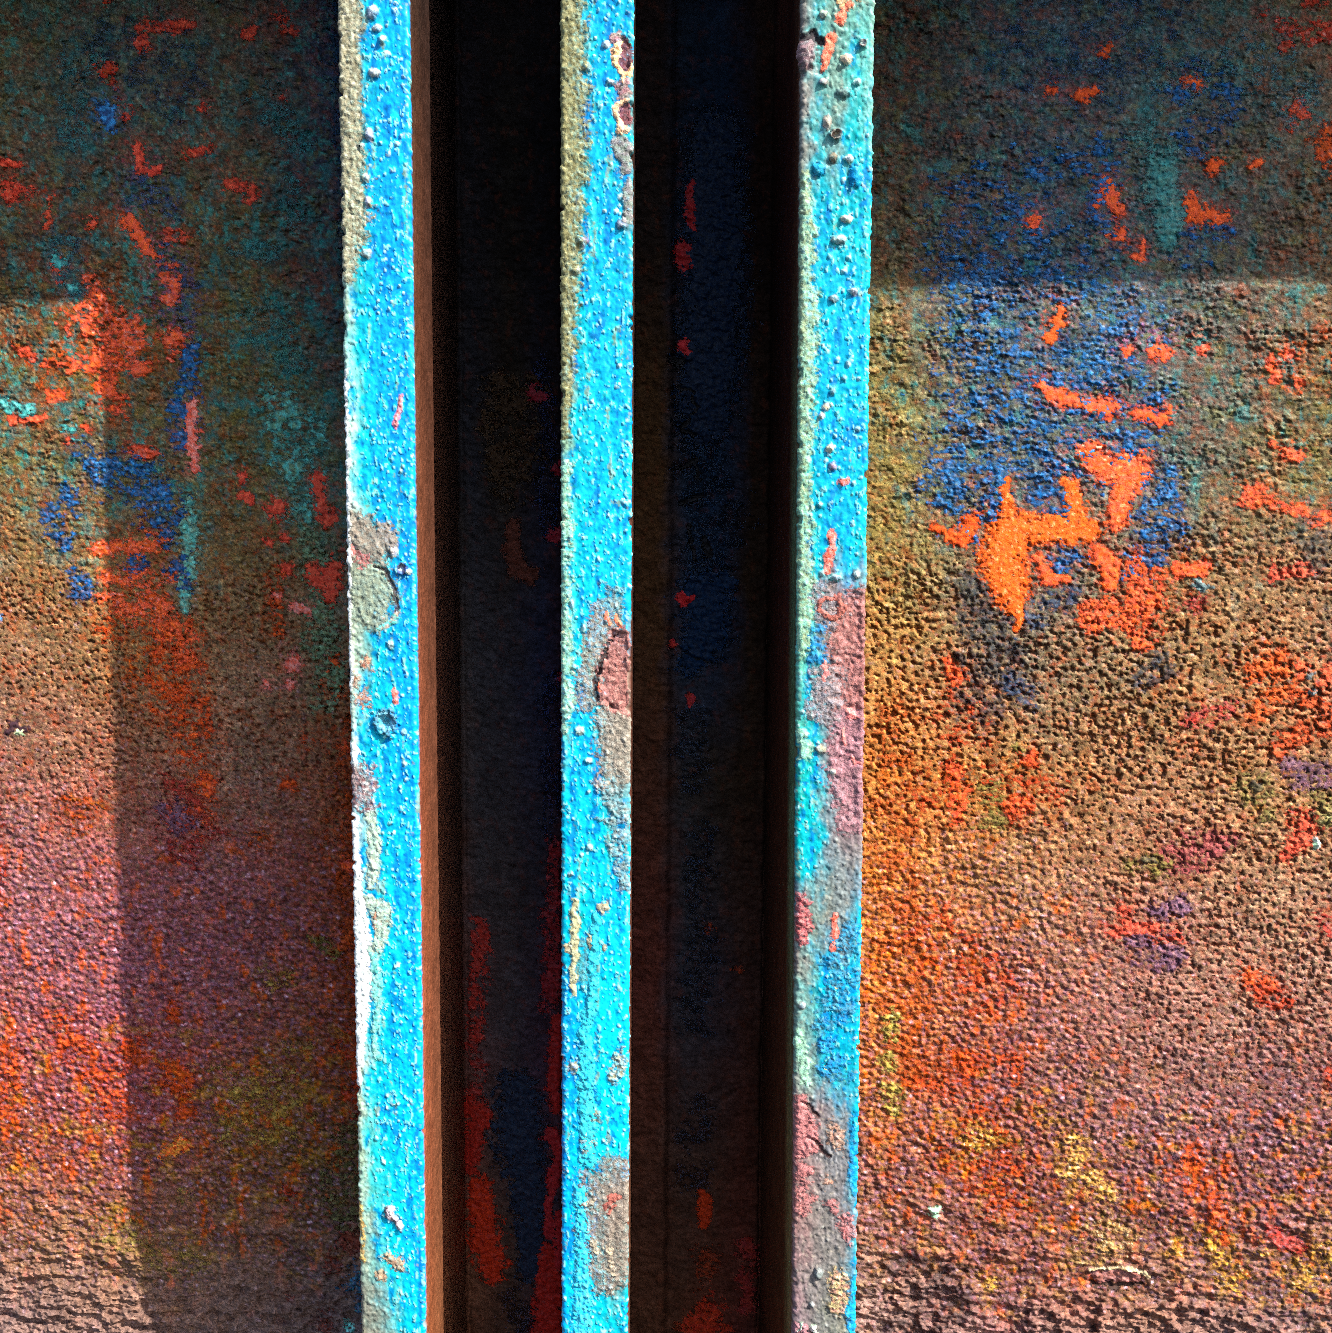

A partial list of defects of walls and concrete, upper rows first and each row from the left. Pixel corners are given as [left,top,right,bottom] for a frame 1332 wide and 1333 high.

peeling [525,0,598,440]
peeling [668,103,761,455]
peeling [236,368,407,718]
peeling [664,568,739,708]
peeling [463,459,632,1333]
peeling [792,1321,817,1333]
peeling [844,1274,857,1333]
peeling [1088,1266,1151,1290]